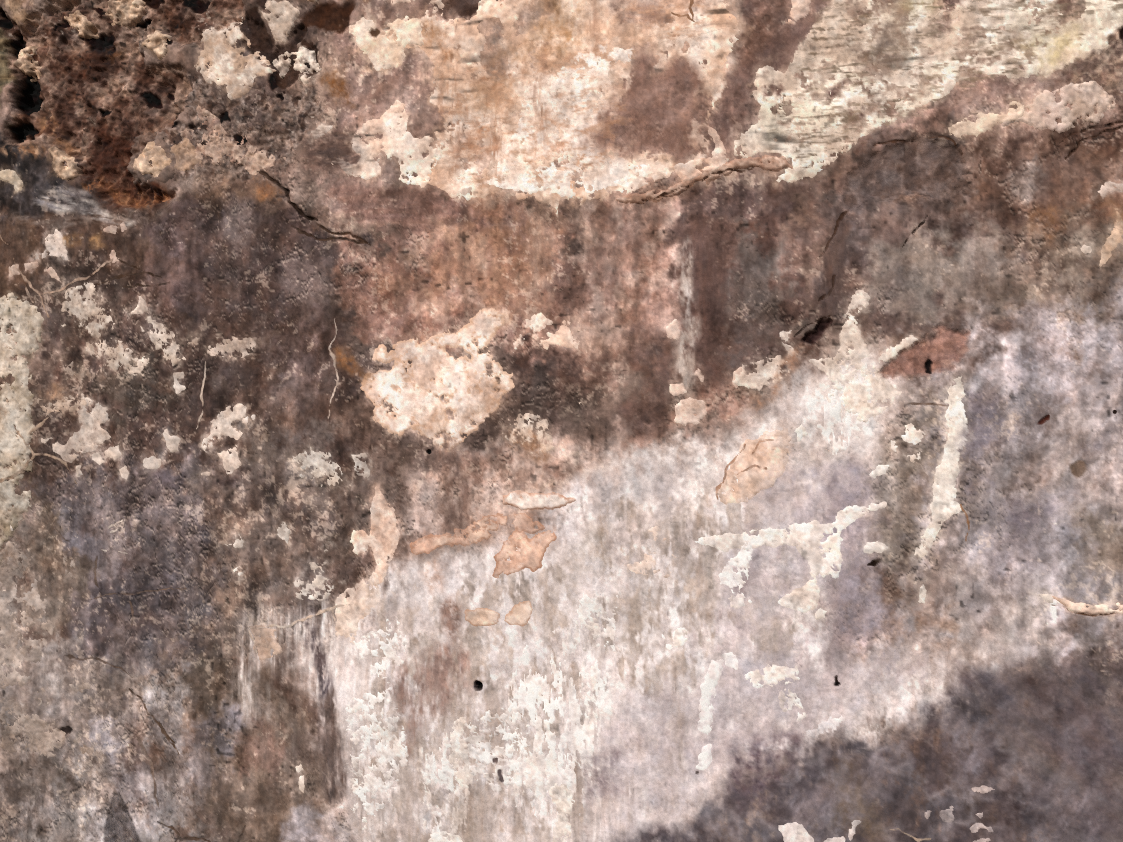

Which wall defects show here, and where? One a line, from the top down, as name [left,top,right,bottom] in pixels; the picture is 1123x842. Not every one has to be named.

corrosion [39,41,130,87]
corrosion [0,110,289,218]
crack [257,170,371,246]
spalling [0,0,1062,217]
water stain [573,0,1123,170]
crack [1059,121,1123,160]
peeling [0,229,256,758]
crack [91,519,187,627]
peeling [293,447,576,830]
water stain [203,197,1123,842]
peeling [715,290,971,557]
crack [64,654,246,842]